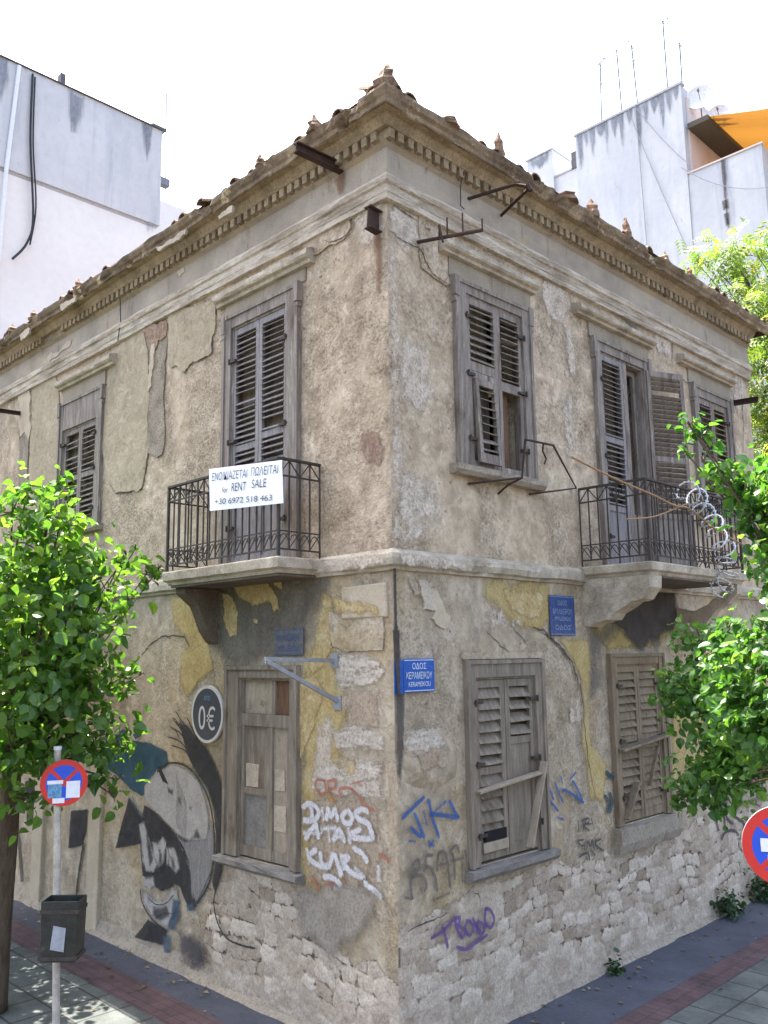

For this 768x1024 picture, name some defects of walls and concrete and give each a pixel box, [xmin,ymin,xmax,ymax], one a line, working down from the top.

flaking render [102,301,217,494]
flaking render [302,203,467,570]
peeling [171,596,213,696]
peeling [222,582,282,637]
flaking render [408,579,451,629]
peeling [484,579,550,629]
crack [486,614,595,794]
flaking render [204,592,768,1024]